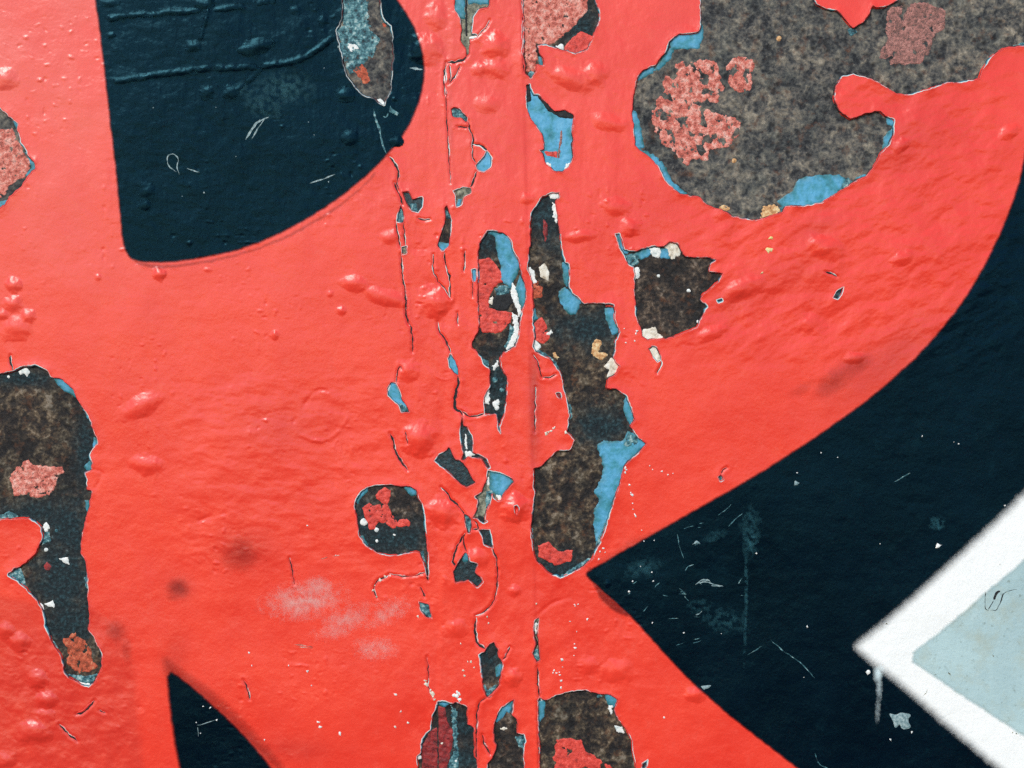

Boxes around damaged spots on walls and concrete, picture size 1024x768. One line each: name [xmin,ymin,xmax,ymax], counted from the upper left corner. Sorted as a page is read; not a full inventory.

peeling [522,0,601,173]
peeling [631,0,1024,222]
peeling [0,364,103,688]
peeling [353,484,430,577]
crack [390,432,409,470]
crack [390,157,475,382]
crack [373,487,510,659]
crack [453,376,484,417]
peeling [433,186,648,579]
peeling [614,232,724,363]
crack [425,656,433,692]
peeling [416,689,649,768]